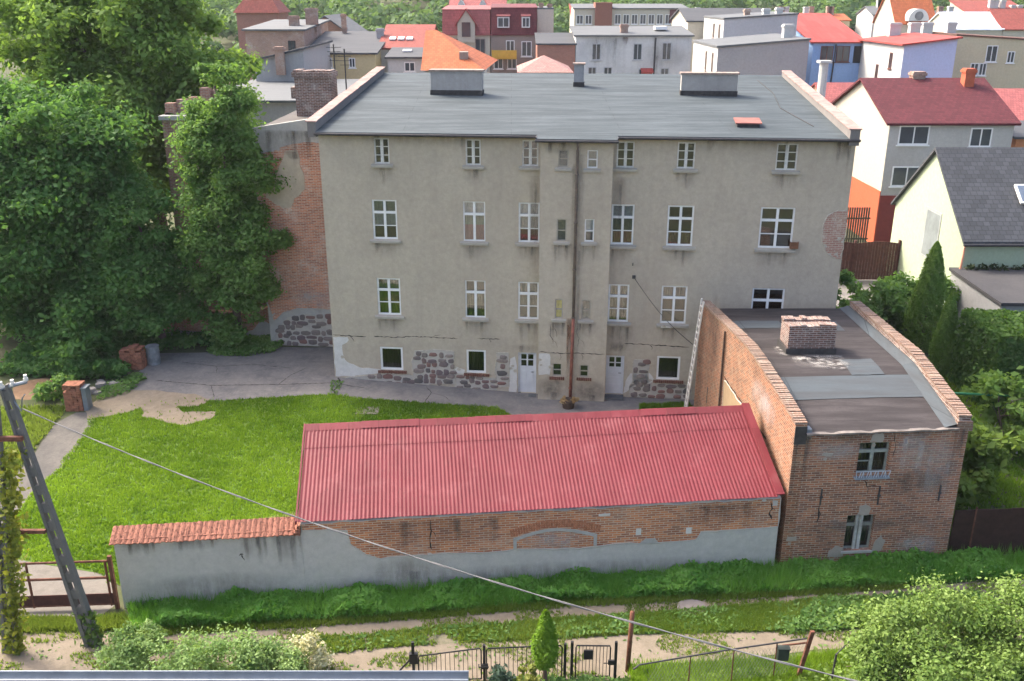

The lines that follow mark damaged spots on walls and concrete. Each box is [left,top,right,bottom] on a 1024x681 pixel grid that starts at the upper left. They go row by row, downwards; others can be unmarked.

spalling [822,210,848,260]
spalling [246,141,517,392]
crack [340,333,496,341]
spalling [300,497,781,559]